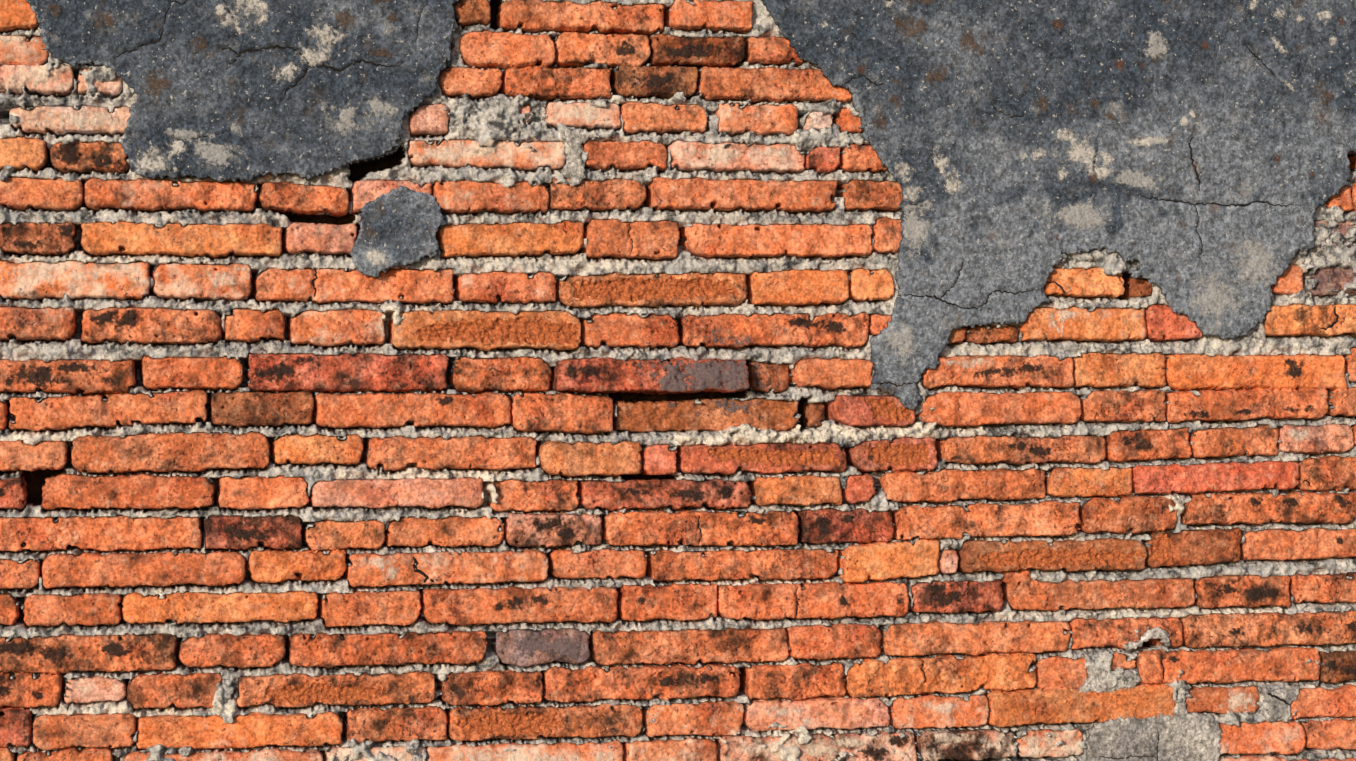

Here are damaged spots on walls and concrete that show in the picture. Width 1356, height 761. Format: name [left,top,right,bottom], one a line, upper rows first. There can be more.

crack [1138,138,1310,267]
spalling [571,276,739,302]
crack [897,259,1065,309]
spalling [413,316,580,346]
spalling [860,398,912,423]
spalling [708,446,840,468]
spalling [862,442,932,468]
spalling [978,534,1176,570]
spalling [263,680,386,706]
spalling [457,710,565,737]